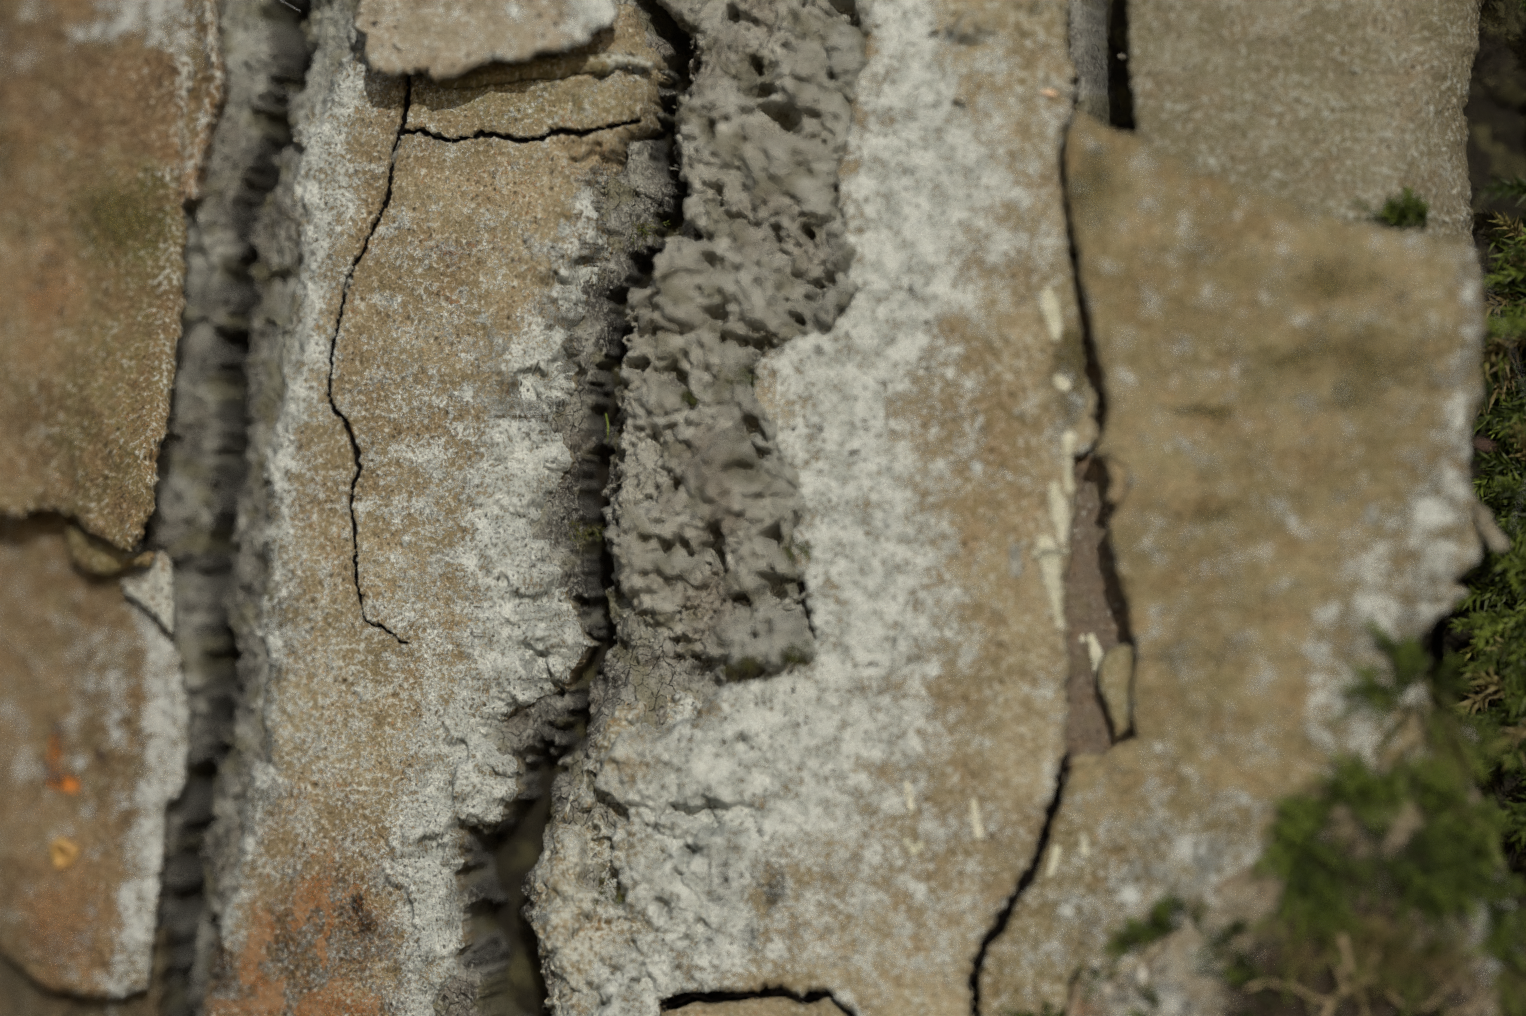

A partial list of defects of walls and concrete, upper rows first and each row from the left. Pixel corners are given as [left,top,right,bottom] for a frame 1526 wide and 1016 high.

crack [1069,0,1122,131]
crack [144,0,767,1016]
crack [783,526,818,638]
crack [969,750,1070,1016]
crack [658,988,853,1016]
crack [1068,961,1122,984]